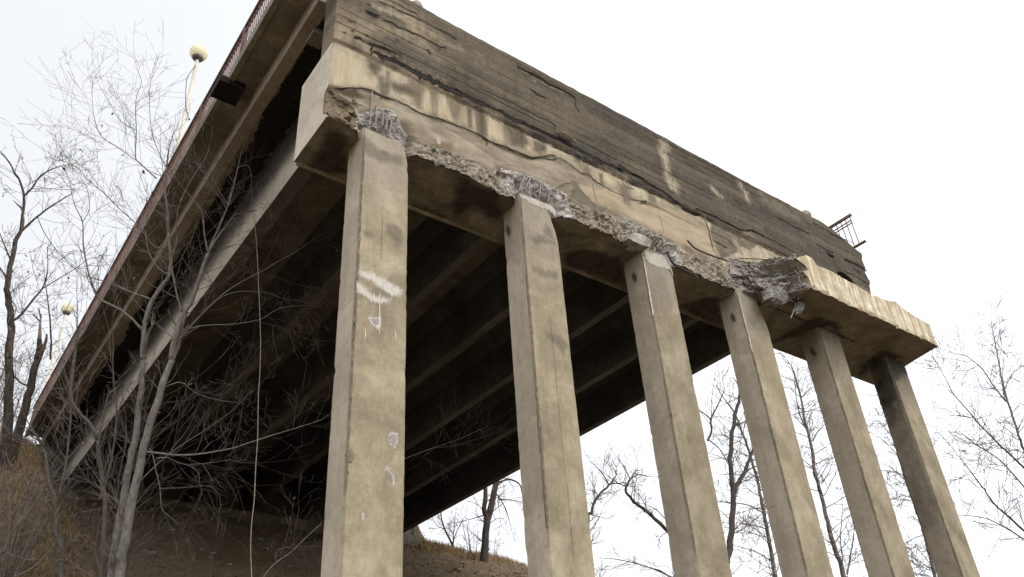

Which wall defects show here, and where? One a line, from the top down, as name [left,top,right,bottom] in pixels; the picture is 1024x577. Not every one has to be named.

damp [369,37,490,134]
damp [503,125,631,212]
crack [328,0,870,285]
efflorescence [659,141,678,191]
damp [711,220,759,258]
damp [740,183,801,223]
peeling [324,87,810,570]